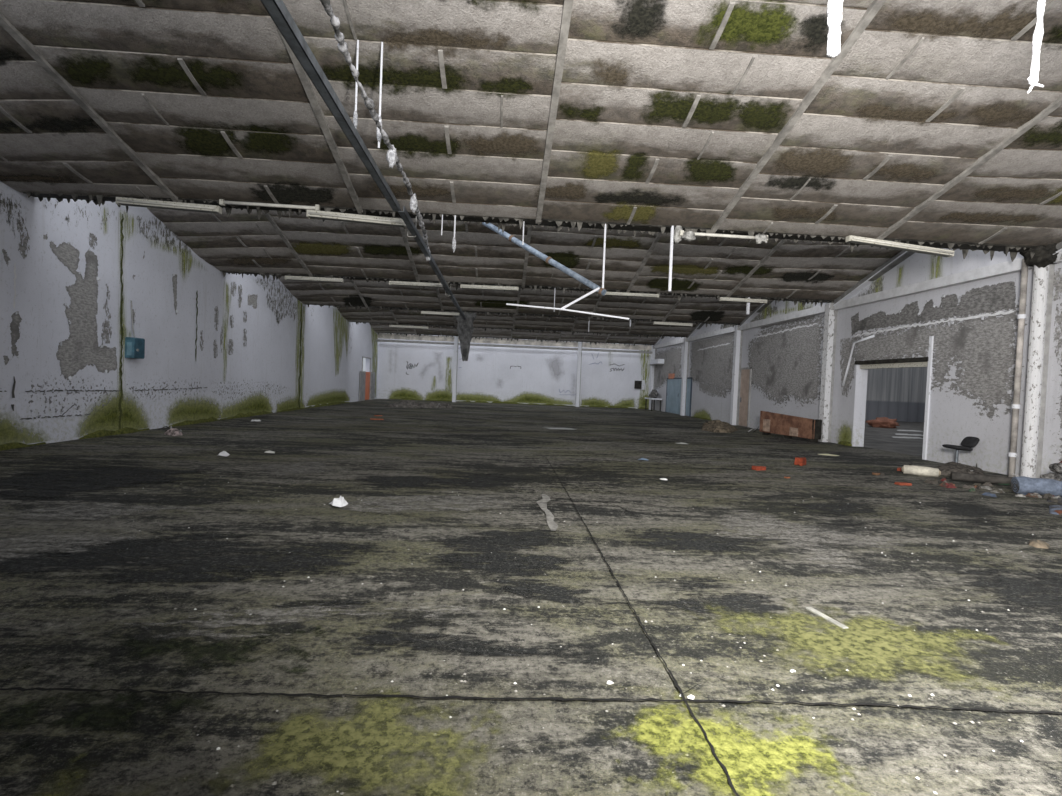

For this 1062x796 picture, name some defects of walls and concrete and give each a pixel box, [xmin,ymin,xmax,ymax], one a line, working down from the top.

mould [613,0,666,38]
mould [801,14,843,51]
damp [559,105,603,122]
damp [738,100,791,131]
damp [536,182,685,207]
damp [767,147,854,191]
peeling [3,311,22,365]
peeling [28,233,117,413]
peeling [655,327,734,398]
peeling [747,306,824,409]
peeling [840,278,1027,423]
crack [0,457,1062,796]